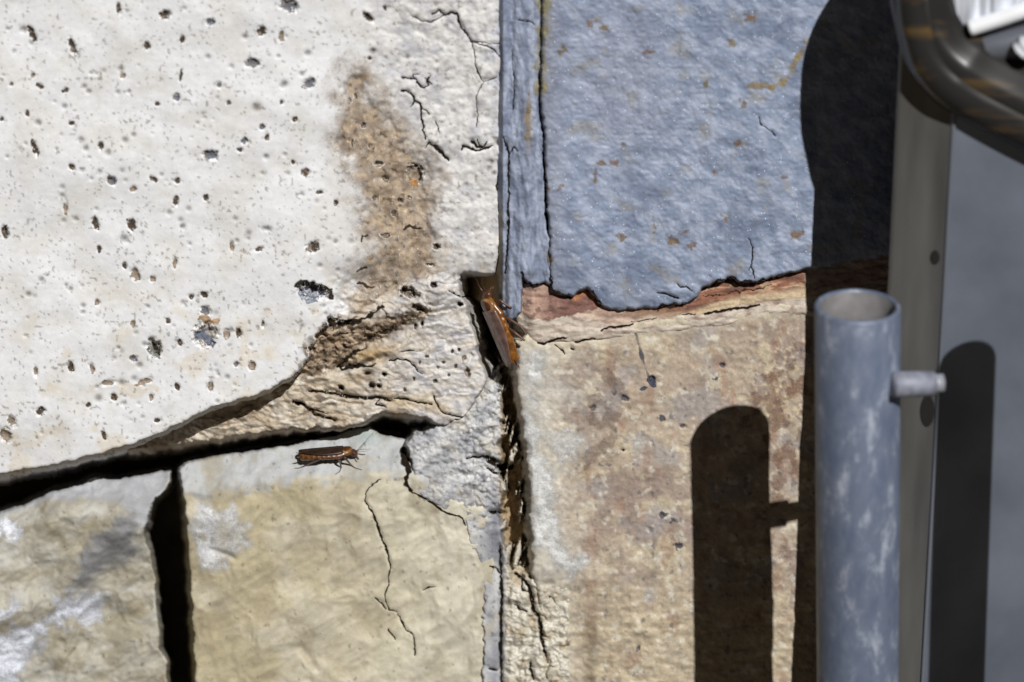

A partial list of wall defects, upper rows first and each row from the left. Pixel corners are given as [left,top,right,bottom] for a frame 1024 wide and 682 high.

spalling [294,56,441,389]
crack [401,9,549,274]
hole [419,348,470,383]
crack [364,447,466,656]
crack [488,545,555,682]